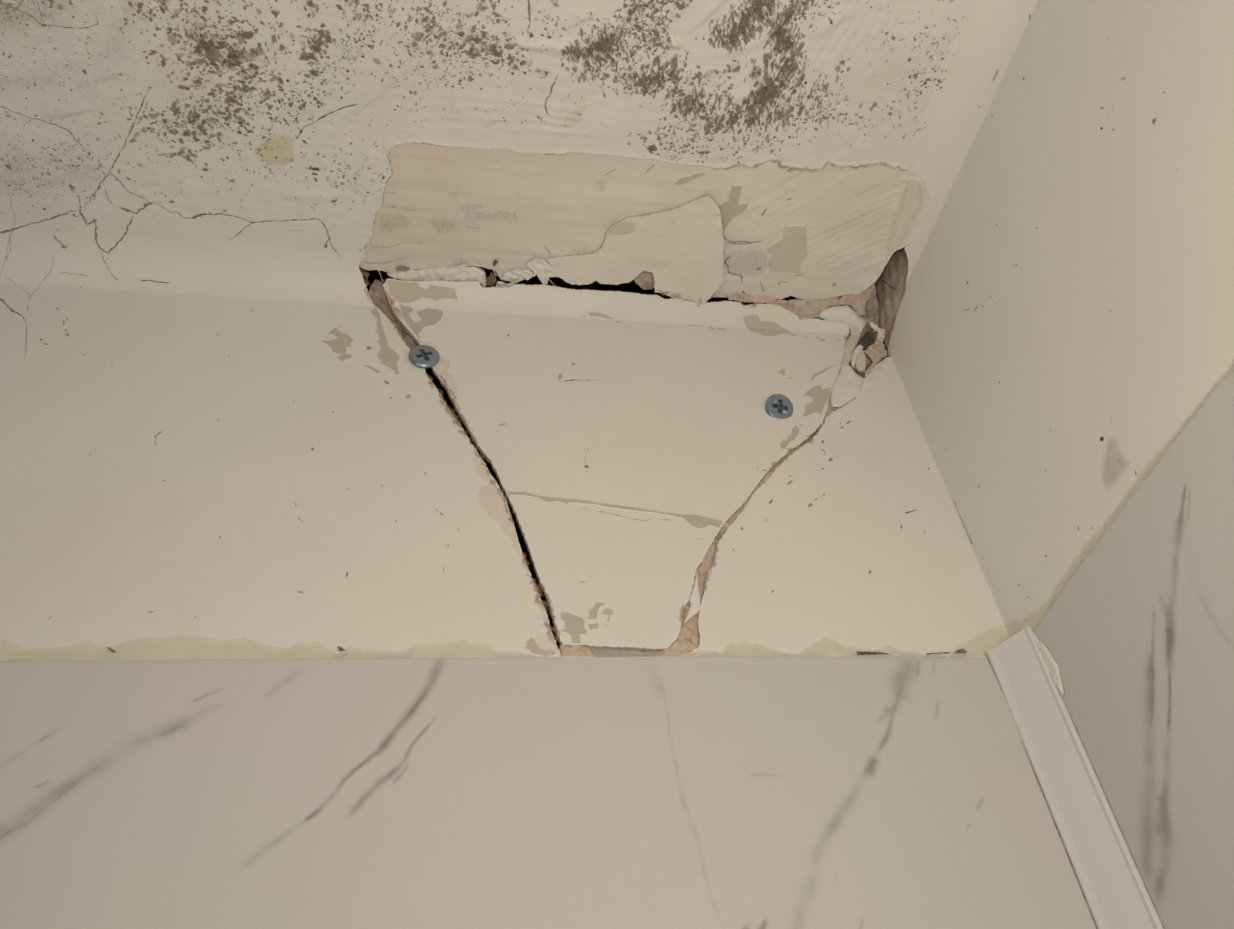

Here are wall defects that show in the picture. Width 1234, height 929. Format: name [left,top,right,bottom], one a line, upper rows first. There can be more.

crack [0,87,341,356]
crack [368,280,418,350]
leakage [0,0,964,216]
peeling [320,137,930,657]
crack [523,429,819,657]